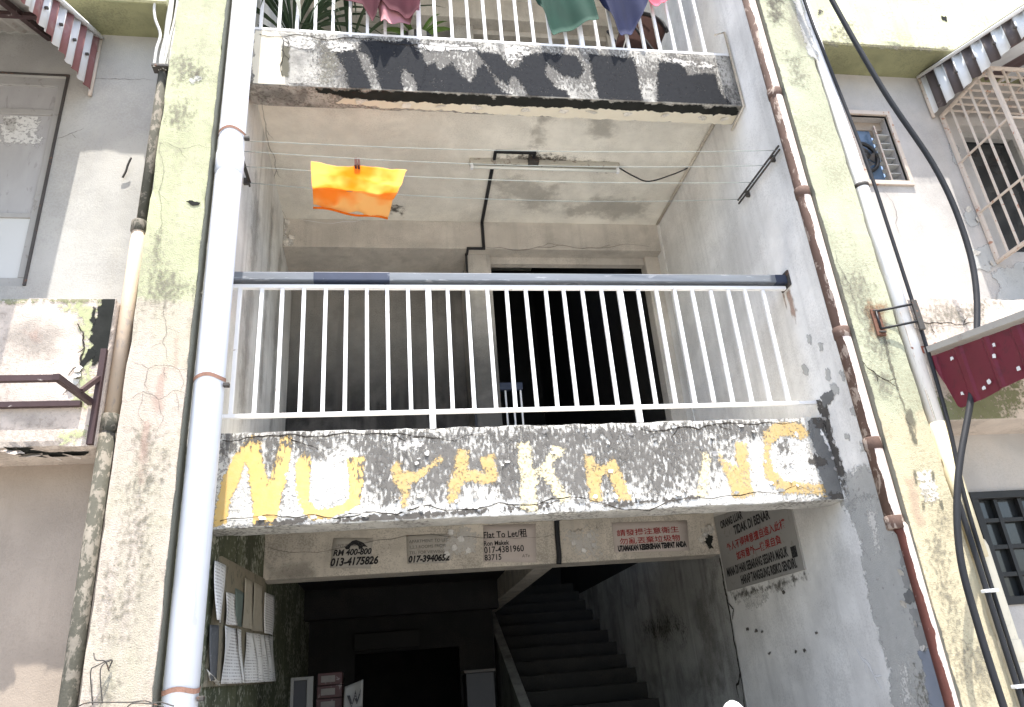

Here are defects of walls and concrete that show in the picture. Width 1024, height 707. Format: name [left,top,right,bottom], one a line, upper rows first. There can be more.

peeling [276,36,354,52]
peeling [418,42,477,52]
peeling [505,45,531,64]
peeling [663,58,714,69]
peeling [0,116,43,146]
damp [102,0,232,707]
spalling [0,447,89,461]
peeling [383,435,429,465]
spalling [794,368,879,512]
spalling [579,483,706,507]
spalling [255,515,317,526]
spalling [337,495,550,559]